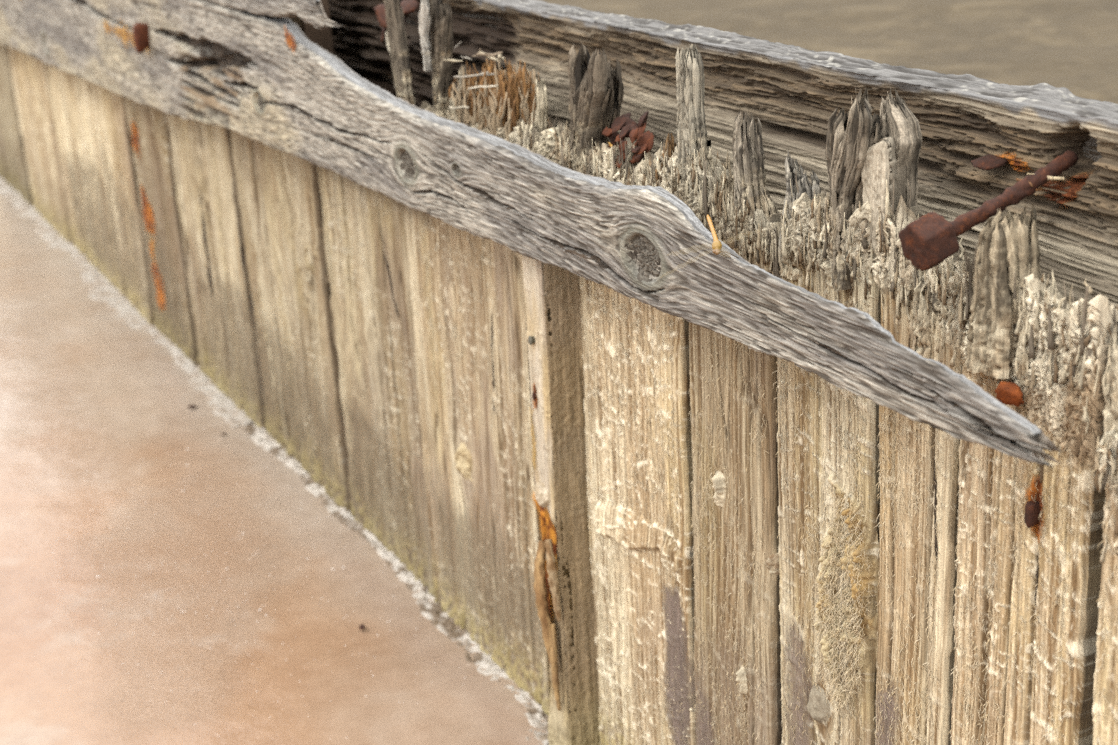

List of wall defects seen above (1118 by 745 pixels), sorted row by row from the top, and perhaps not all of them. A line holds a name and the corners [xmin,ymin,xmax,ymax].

crack [155,30,380,161]
corrosion [131,122,140,158]
corrosion [971,154,1028,172]
corrosion [1042,173,1087,208]
corrosion [140,185,165,309]
corrosion [1025,476,1044,541]
corrosion [532,494,558,624]